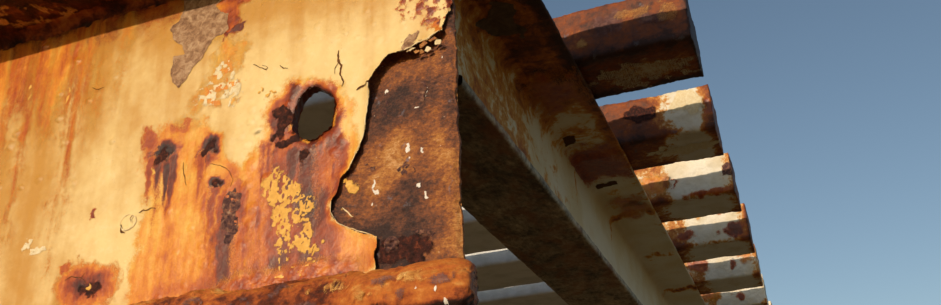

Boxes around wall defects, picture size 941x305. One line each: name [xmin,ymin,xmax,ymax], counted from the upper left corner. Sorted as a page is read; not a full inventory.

peeling [170,0,245,88]
peeling [193,60,243,107]
corrosion [0,0,377,305]
corrosion [564,140,733,205]
peeling [261,166,325,278]
corrosion [674,218,698,241]
corrosion [716,220,749,242]
corrosion [687,260,709,275]
corrosion [730,253,754,270]
corrosion [701,292,745,303]